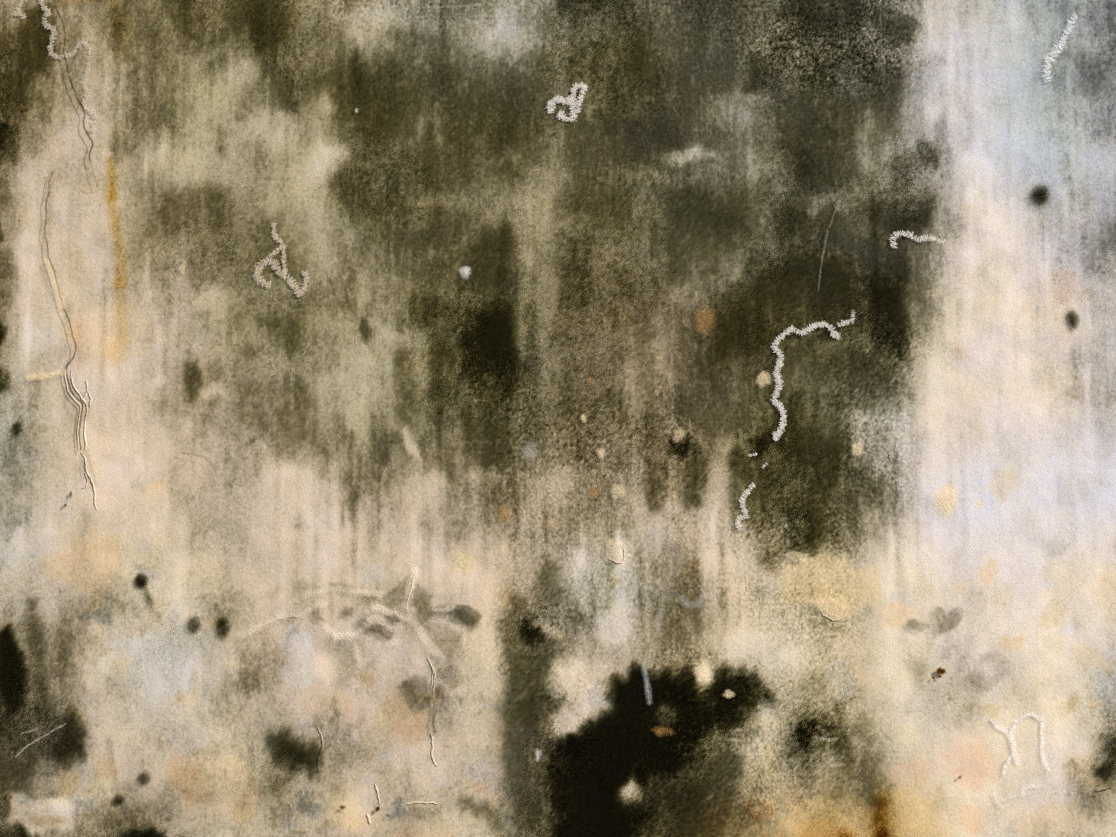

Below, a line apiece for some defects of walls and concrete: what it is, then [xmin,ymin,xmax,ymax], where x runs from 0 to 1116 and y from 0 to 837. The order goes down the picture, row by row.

crack [56,7,93,161]
leakage [1075,54,1115,95]
crack [44,175,97,510]
mould [393,217,527,472]
leakage [546,0,940,569]
mould [0,822,40,837]
mould [0,599,88,795]
mould [113,821,167,837]
mould [460,555,777,837]
corrosion [877,798,887,837]
mould [1096,730,1116,786]